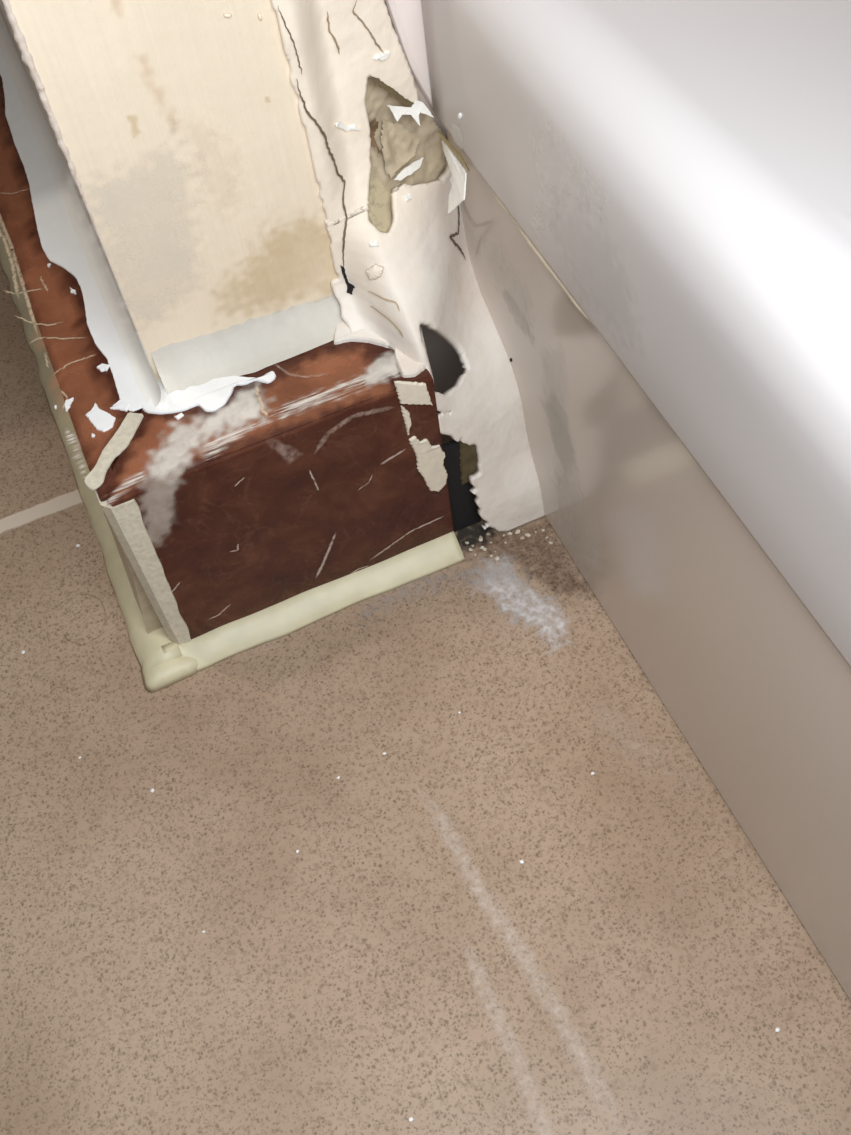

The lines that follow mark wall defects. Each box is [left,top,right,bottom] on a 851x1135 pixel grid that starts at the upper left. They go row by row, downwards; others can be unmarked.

crack [327,1,414,107]
crack [278,8,403,337]
peeling [335,77,470,247]
peeling [401,406,448,492]